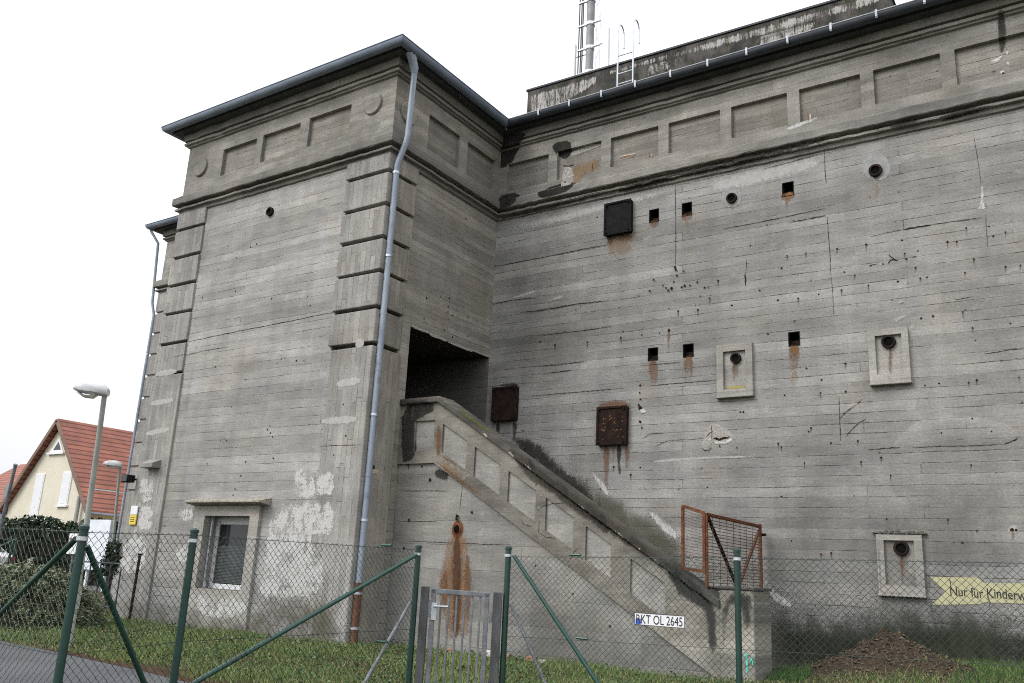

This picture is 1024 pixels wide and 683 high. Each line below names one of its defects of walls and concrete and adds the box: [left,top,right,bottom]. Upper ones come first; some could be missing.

spalling [561,144,601,186]
water stain [401,401,434,469]
rust [604,445,629,477]
spalling [701,424,733,451]
peeling [260,467,336,600]
rust [440,537,470,634]